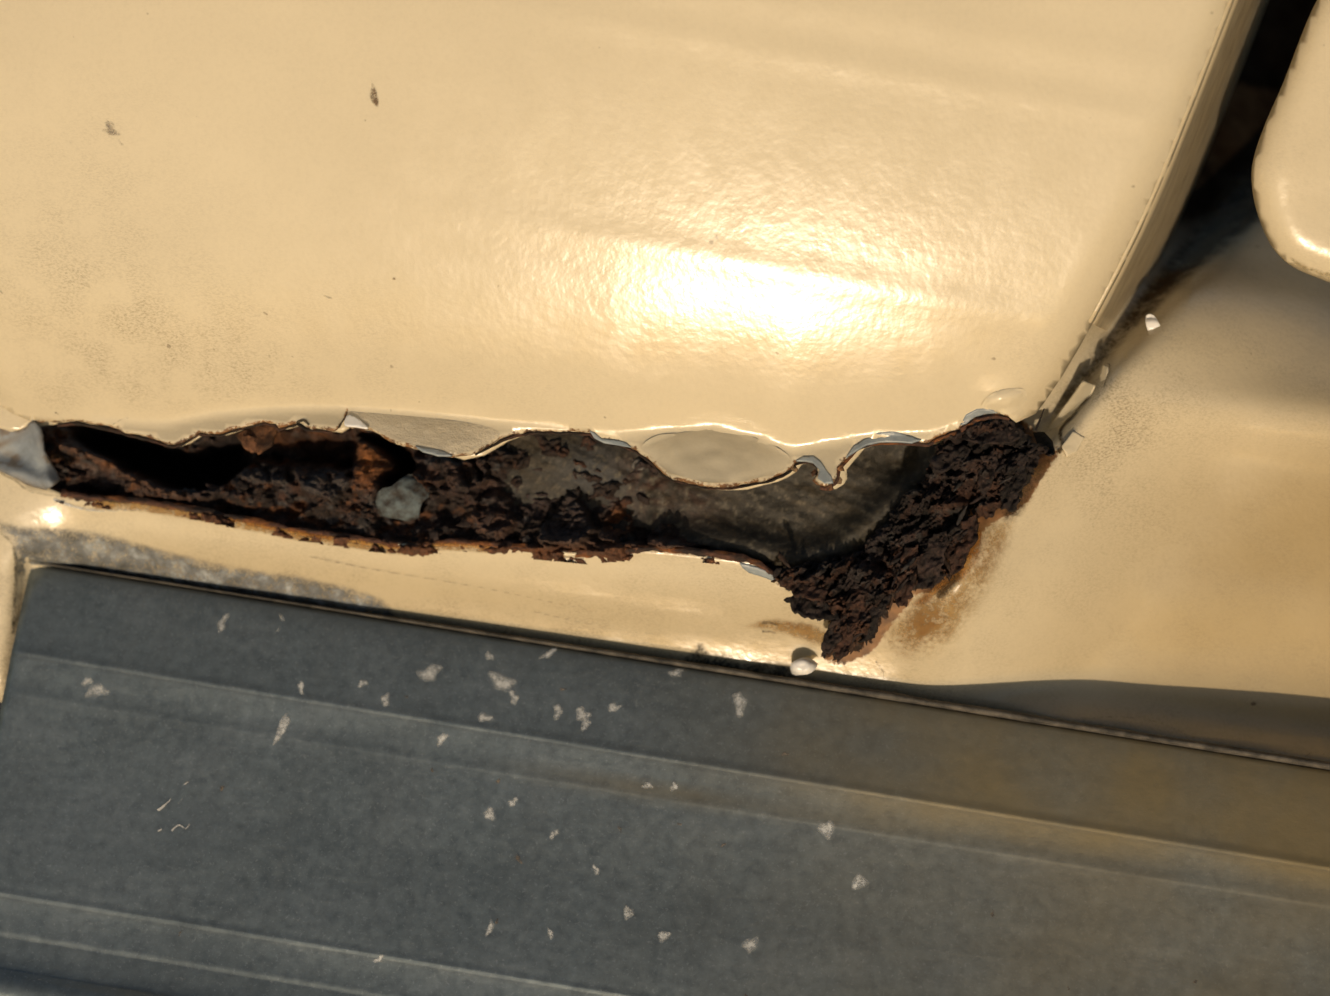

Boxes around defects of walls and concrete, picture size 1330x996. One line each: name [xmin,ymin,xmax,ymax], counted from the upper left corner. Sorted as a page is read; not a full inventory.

peeling [234,425,278,455]
peeling [344,411,499,457]
peeling [589,430,632,448]
peeling [0,422,104,512]
rust [95,500,202,519]
rust [229,518,400,552]
rust [431,543,490,552]
rust [758,414,1054,659]
peeling [739,364,1109,663]
peeling [1,527,393,633]